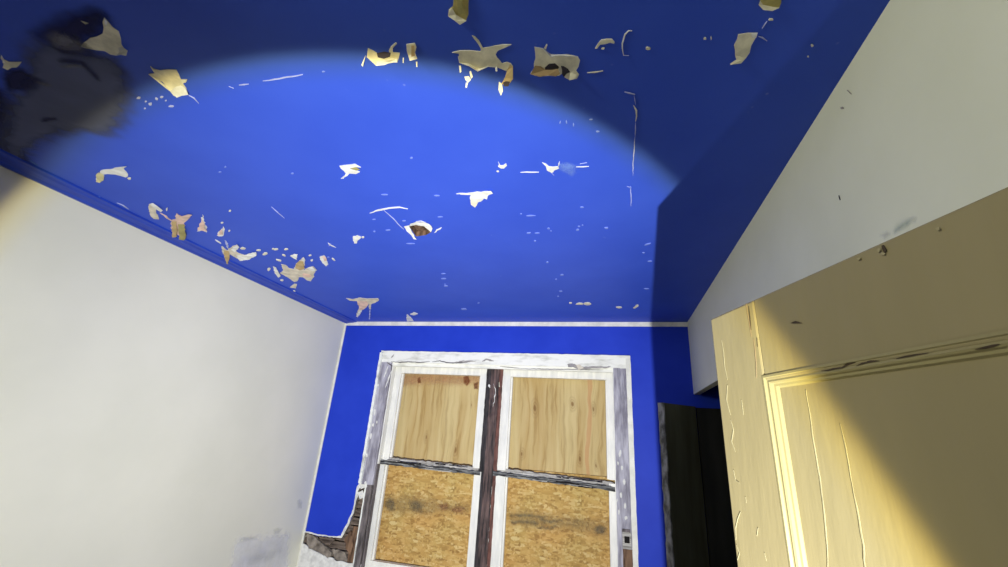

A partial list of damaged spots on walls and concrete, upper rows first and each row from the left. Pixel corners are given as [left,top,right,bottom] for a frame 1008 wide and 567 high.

damp [0,10,130,159]
peeling [136,66,199,109]
peeling [361,42,417,67]
peeling [452,35,513,95]
peeling [530,44,580,80]
peeling [730,0,781,65]
peeling [340,164,361,179]
peeling [456,191,493,207]
peeling [148,203,335,292]
spalling [298,481,367,567]
crack [806,392,828,567]
crack [840,424,866,567]